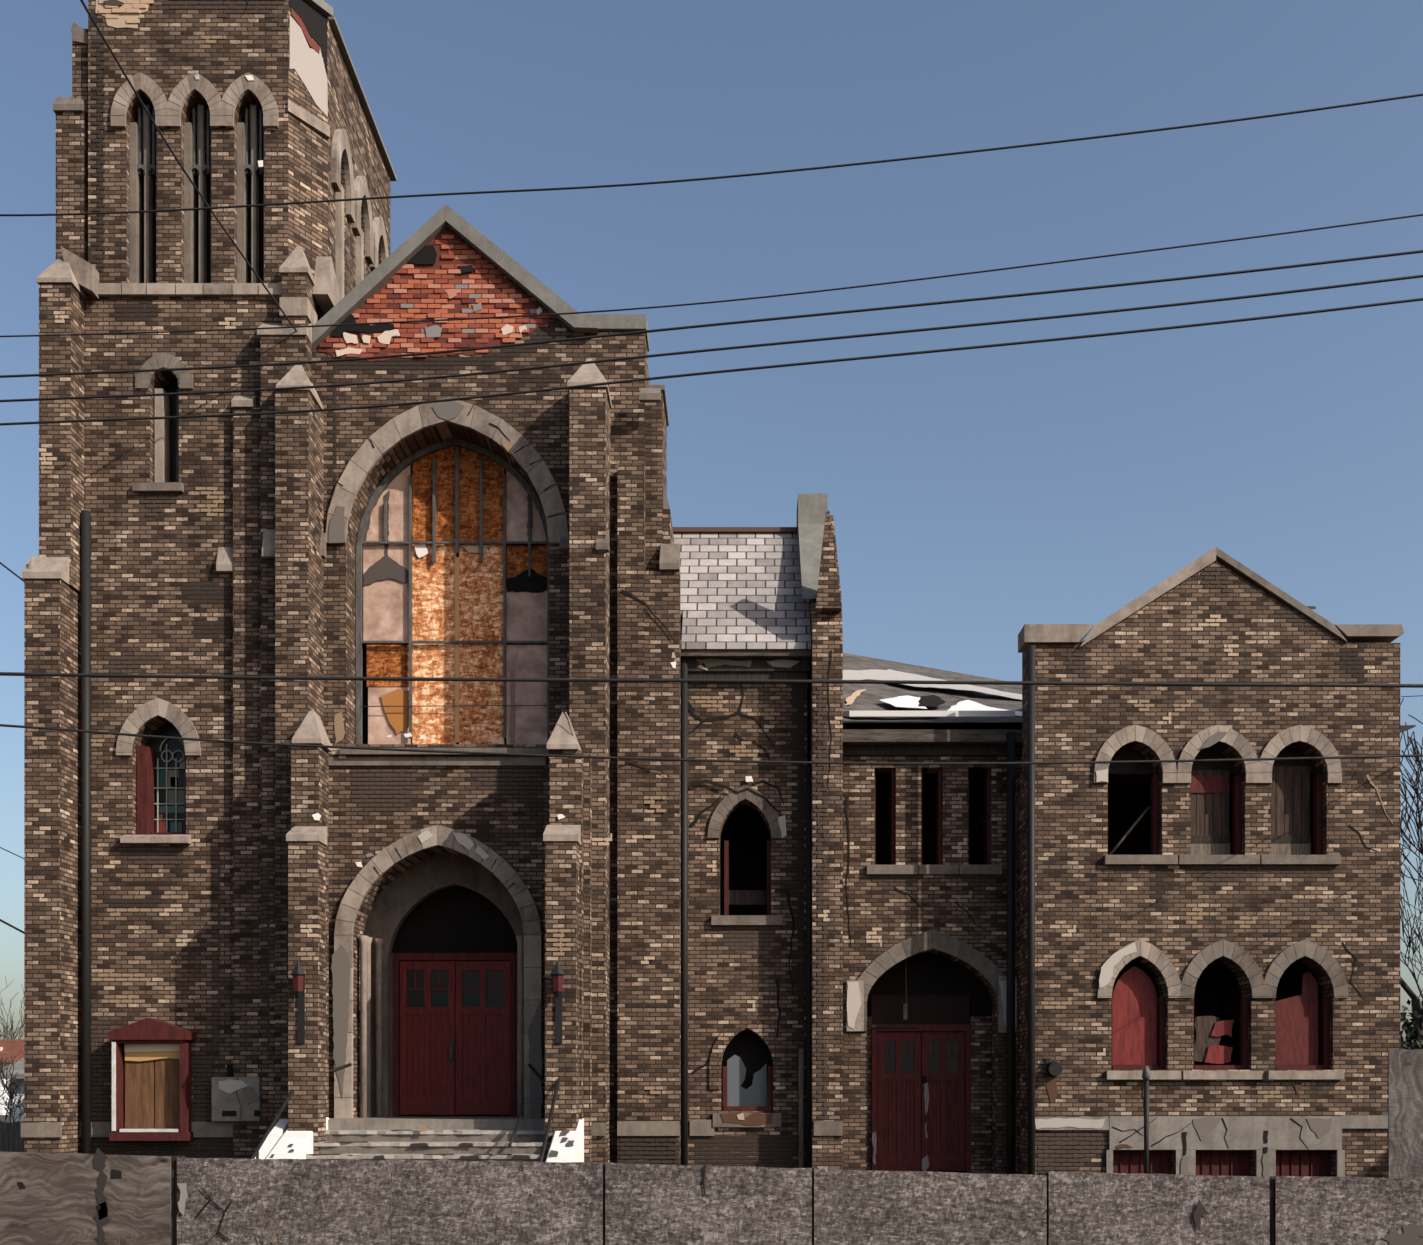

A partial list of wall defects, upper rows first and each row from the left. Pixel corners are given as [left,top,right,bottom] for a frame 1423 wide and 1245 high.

flaking render [95,0,154,29]
spalling [317,229,550,362]
crack [1112,1118,1229,1148]